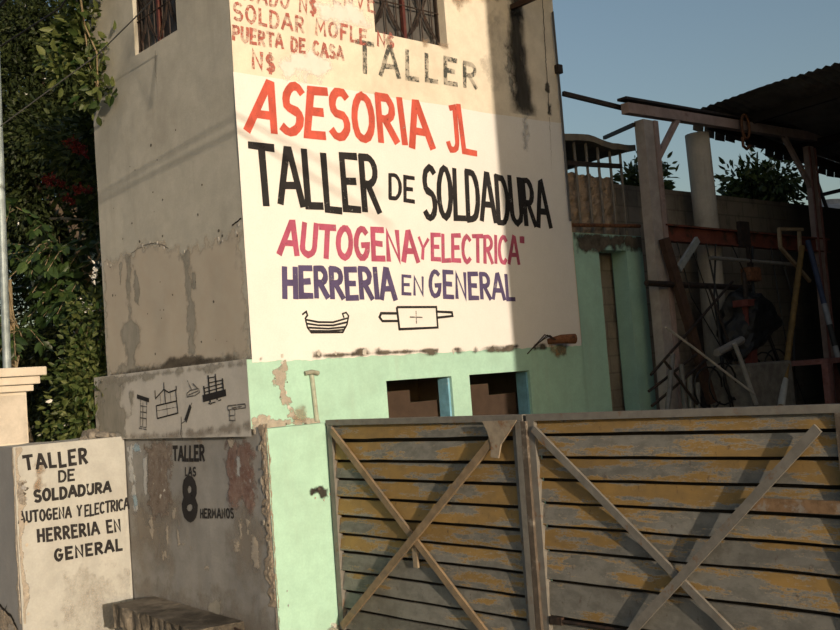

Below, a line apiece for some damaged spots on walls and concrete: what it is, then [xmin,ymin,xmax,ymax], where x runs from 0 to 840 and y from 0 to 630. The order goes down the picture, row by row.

leakage [507,0,534,114]
peeling [272,354,315,425]
peeling [314,348,438,357]
spalling [11,447,30,624]
peeling [127,438,174,521]
peeling [225,415,289,630]
spalling [310,486,331,501]
crack [0,604,18,630]